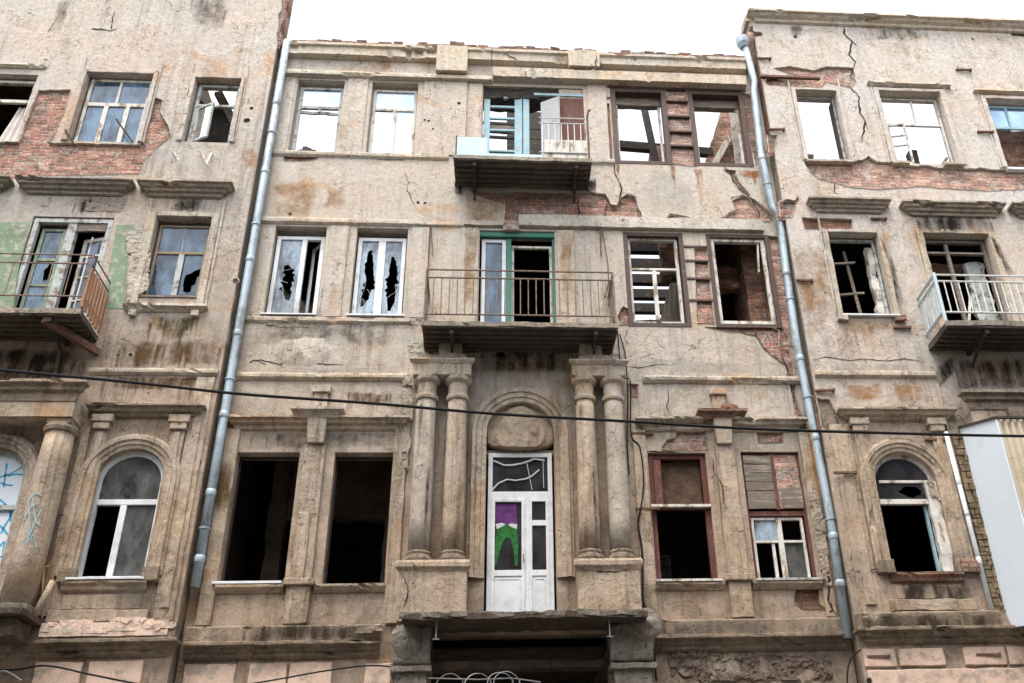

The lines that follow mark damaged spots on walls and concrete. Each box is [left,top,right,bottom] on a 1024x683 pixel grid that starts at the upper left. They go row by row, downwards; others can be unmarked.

crack [843,26,868,143]
flaking render [0,89,171,178]
flaking render [469,189,643,221]
crack [577,165,642,217]
flaking render [668,169,853,230]
flaking render [804,155,1024,192]
water stain [121,318,220,392]
flaking render [693,235,842,430]
crack [818,354,918,362]
flaking render [660,432,708,452]
peeling [41,617,176,634]